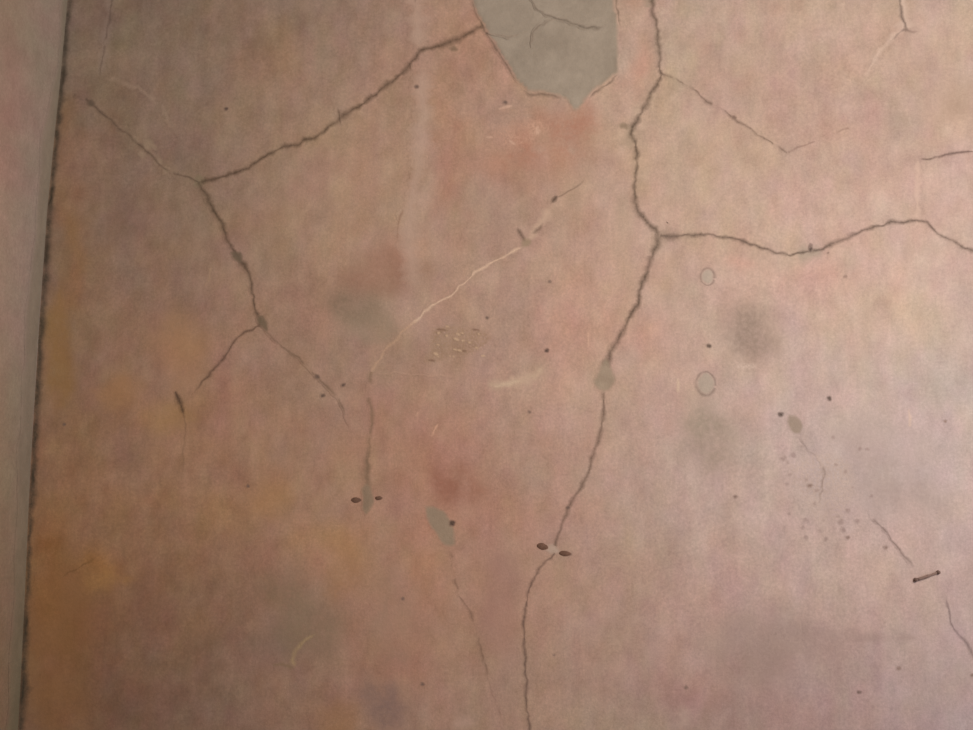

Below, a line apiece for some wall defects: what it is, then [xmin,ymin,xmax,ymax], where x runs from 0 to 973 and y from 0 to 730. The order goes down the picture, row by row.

crack [18,0,608,730]
crack [449,0,973,730]